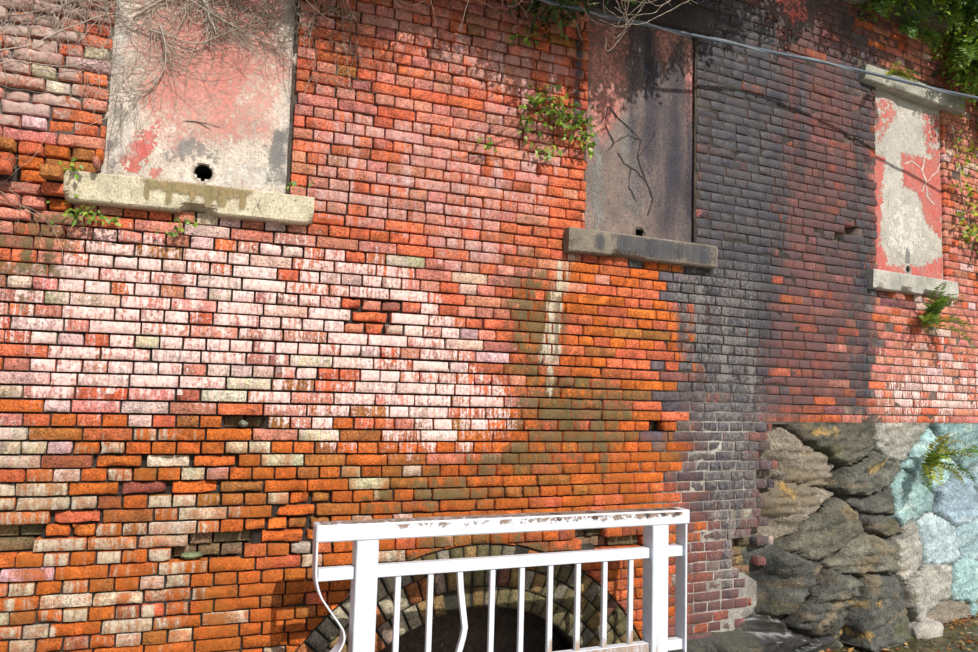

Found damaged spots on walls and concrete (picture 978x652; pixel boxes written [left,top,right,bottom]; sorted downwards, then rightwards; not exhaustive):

peeling [107,0,291,183]
leakage [143,164,285,209]
leakage [572,15,584,125]
flaking render [761,0,829,34]
peeling [875,97,897,143]
peeling [874,155,943,280]
peeling [901,112,942,240]
leakage [0,221,519,460]
spalling [342,298,403,335]
leakage [540,254,575,397]
leakage [597,0,978,652]
spalling [0,510,100,551]